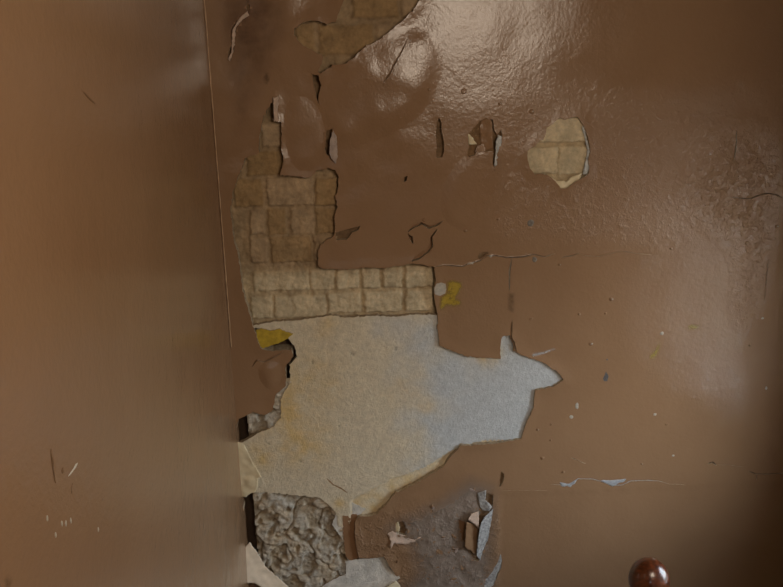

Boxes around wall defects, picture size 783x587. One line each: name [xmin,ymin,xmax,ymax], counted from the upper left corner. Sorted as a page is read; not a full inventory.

flaking render [294,0,419,73]
flaking render [527,117,590,188]
flaking render [232,96,562,587]